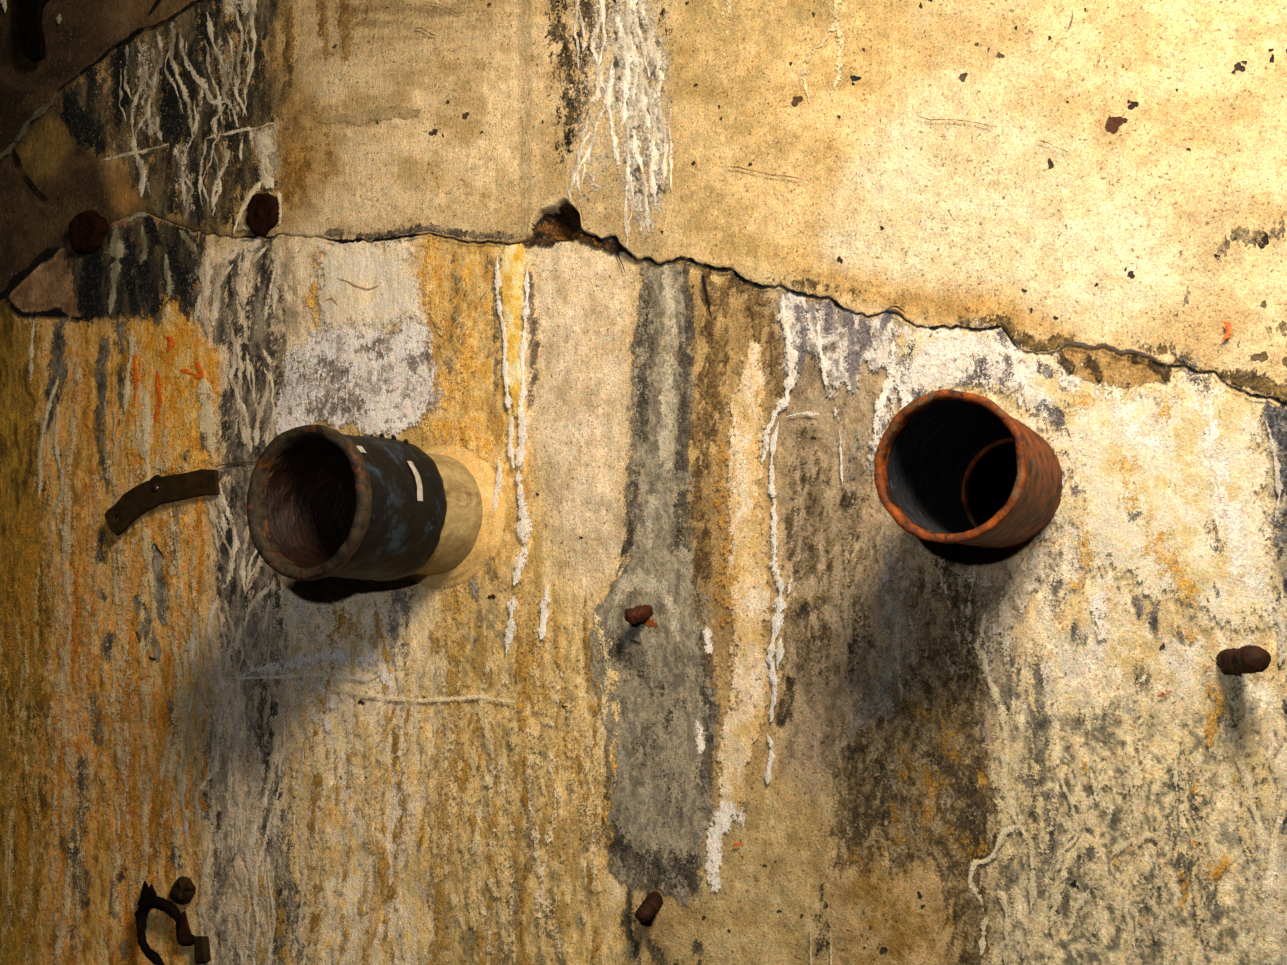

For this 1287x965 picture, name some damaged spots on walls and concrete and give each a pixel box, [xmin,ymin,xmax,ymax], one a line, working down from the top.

crack [0,0,200,203]
crack [0,246,86,321]
crack [241,232,282,240]
crack [324,233,526,246]
crack [579,216,1019,349]
crack [1162,364,1287,406]
leakage [28,0,541,965]
leakage [543,0,1287,965]
rust [0,294,223,965]
leakage [537,585,551,639]
leakage [485,756,578,965]